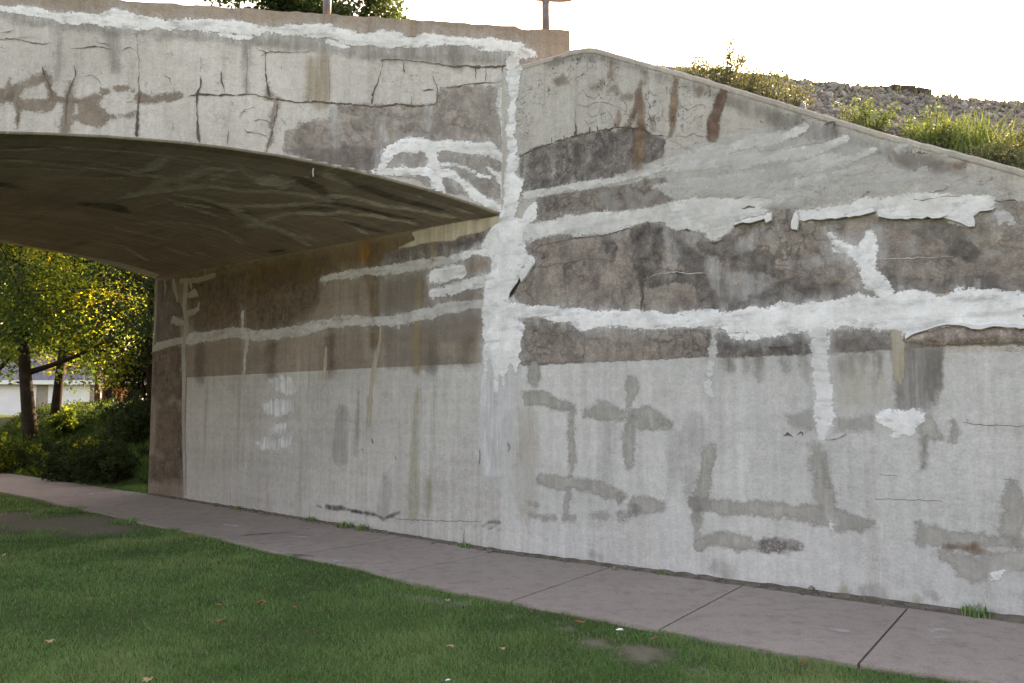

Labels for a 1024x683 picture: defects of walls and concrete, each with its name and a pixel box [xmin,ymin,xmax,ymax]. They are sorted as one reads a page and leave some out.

crack [2,30,140,137]
crack [164,48,506,151]
crack [519,61,705,157]
corrosion [616,80,645,170]
corrosion [669,79,678,137]
corrosion [706,89,727,143]
spalling [509,122,1024,366]
damp [241,310,249,375]
damp [523,361,672,521]
damp [716,328,958,467]
damp [688,443,874,553]